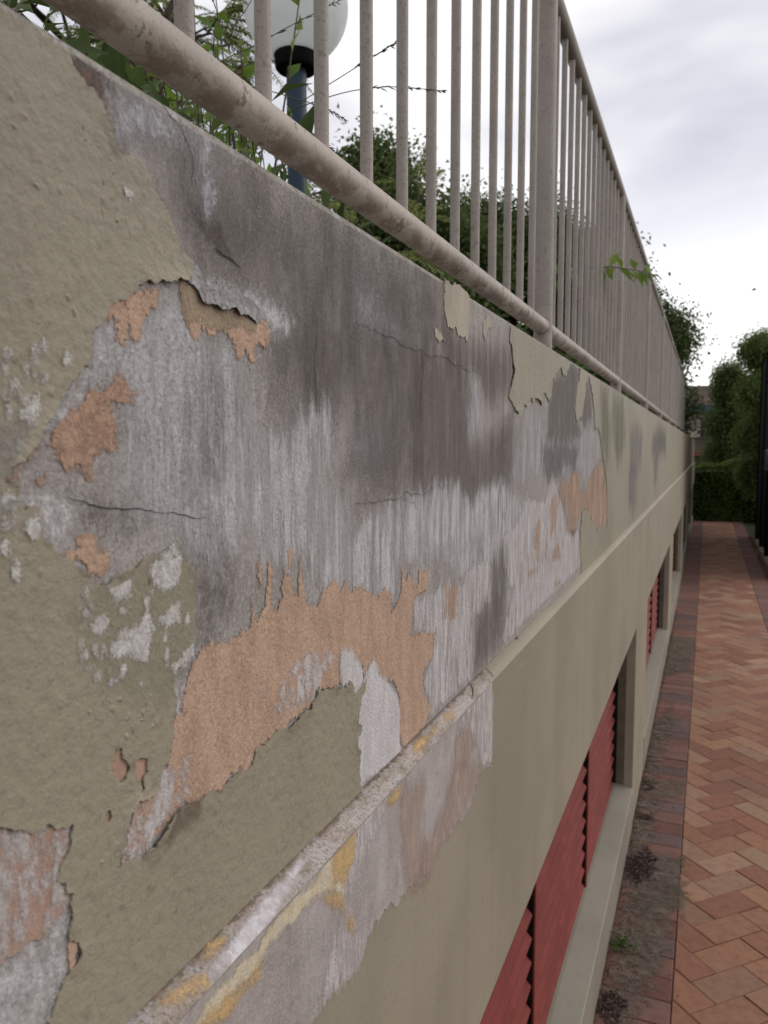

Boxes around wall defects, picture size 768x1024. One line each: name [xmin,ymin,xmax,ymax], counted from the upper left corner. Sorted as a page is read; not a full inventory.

crack [67,495,210,519]
peeling [0,55,607,1024]